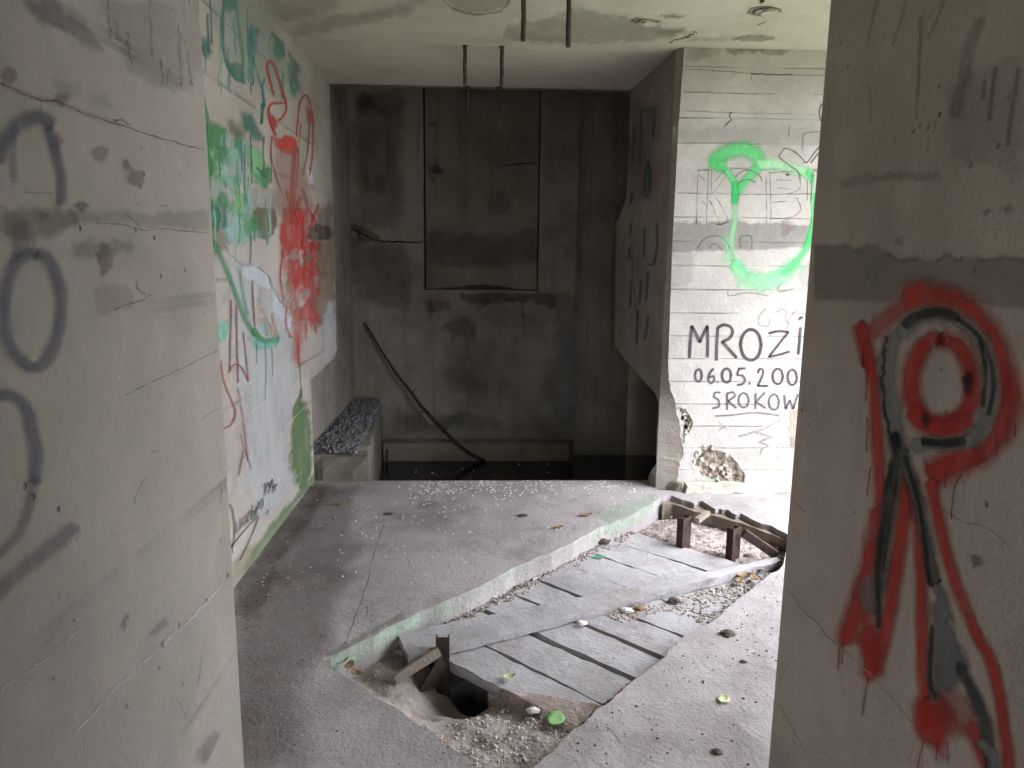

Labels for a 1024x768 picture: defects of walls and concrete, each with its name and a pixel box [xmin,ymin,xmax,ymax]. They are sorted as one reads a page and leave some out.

crack [1,83,204,150]
crack [351,228,422,243]
spalling [678,406,693,443]
spalling [693,445,746,483]
crack [346,525,384,641]